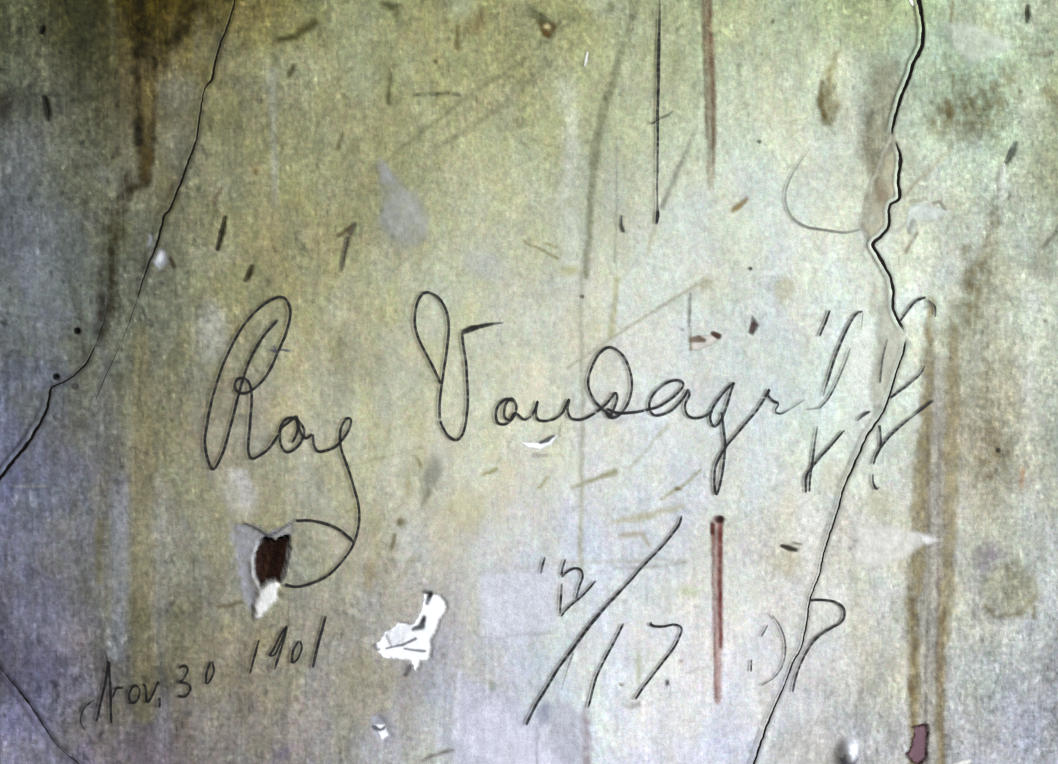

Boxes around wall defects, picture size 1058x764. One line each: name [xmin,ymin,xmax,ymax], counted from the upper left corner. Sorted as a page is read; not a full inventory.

corrosion [703,0,715,148]
crack [0,0,236,487]
crack [749,0,929,764]
spalling [233,523,291,618]
spalling [375,591,448,676]
corrosion [711,516,724,702]
damp [906,299,959,764]
crack [0,667,79,764]
spalling [906,724,929,764]